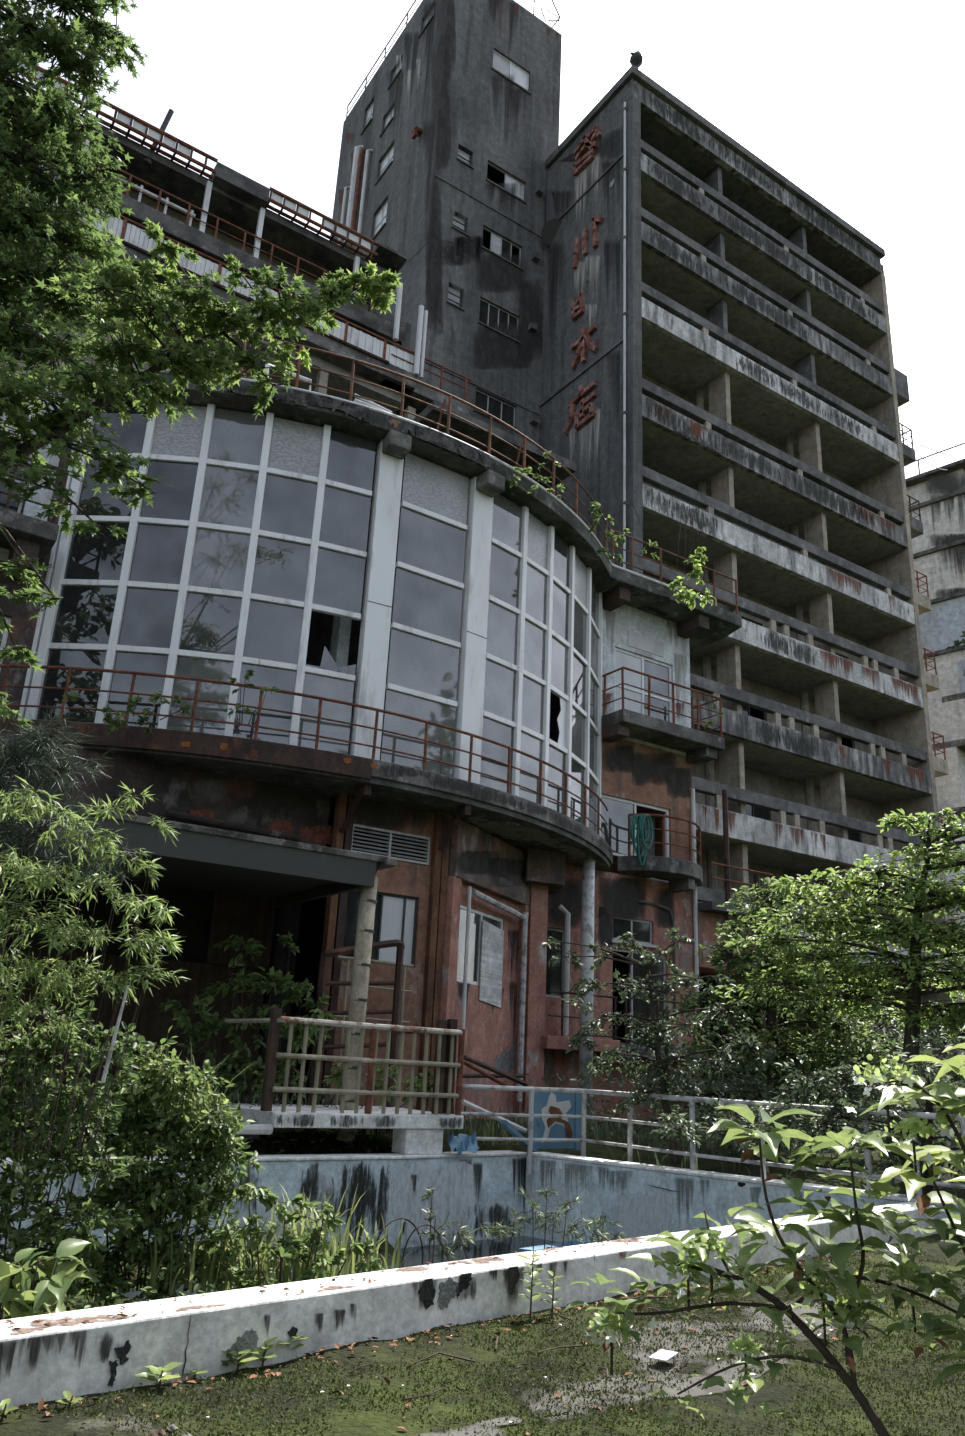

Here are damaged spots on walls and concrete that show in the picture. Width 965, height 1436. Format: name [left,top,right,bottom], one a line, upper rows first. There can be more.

water stain [389,0,561,369]
water stain [552,131,620,216]
water stain [574,243,620,326]
rust [821,651,917,698]
water stain [300,1161,406,1242]
peeling [389,1161,476,1245]
peeling [395,1256,503,1310]
water stain [0,1331,86,1375]